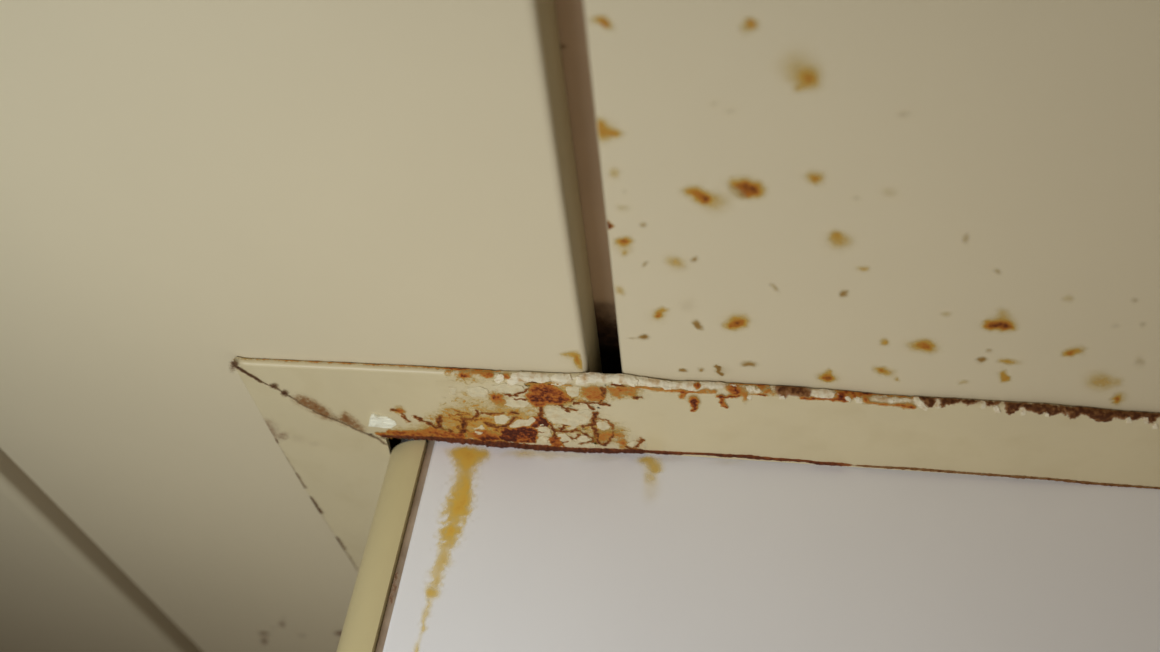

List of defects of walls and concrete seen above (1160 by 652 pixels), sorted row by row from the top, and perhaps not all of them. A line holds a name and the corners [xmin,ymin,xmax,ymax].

corrosion [594,17,610,28]
corrosion [795,68,818,90]
corrosion [597,120,620,140]
corrosion [685,187,717,206]
corrosion [729,179,764,199]
corrosion [725,316,748,330]
corrosion [983,316,1015,331]
corrosion [912,340,935,351]
corrosion [563,352,582,369]
peeling [494,371,786,400]
peeling [810,389,913,403]
corrosion [234,358,1160,597]